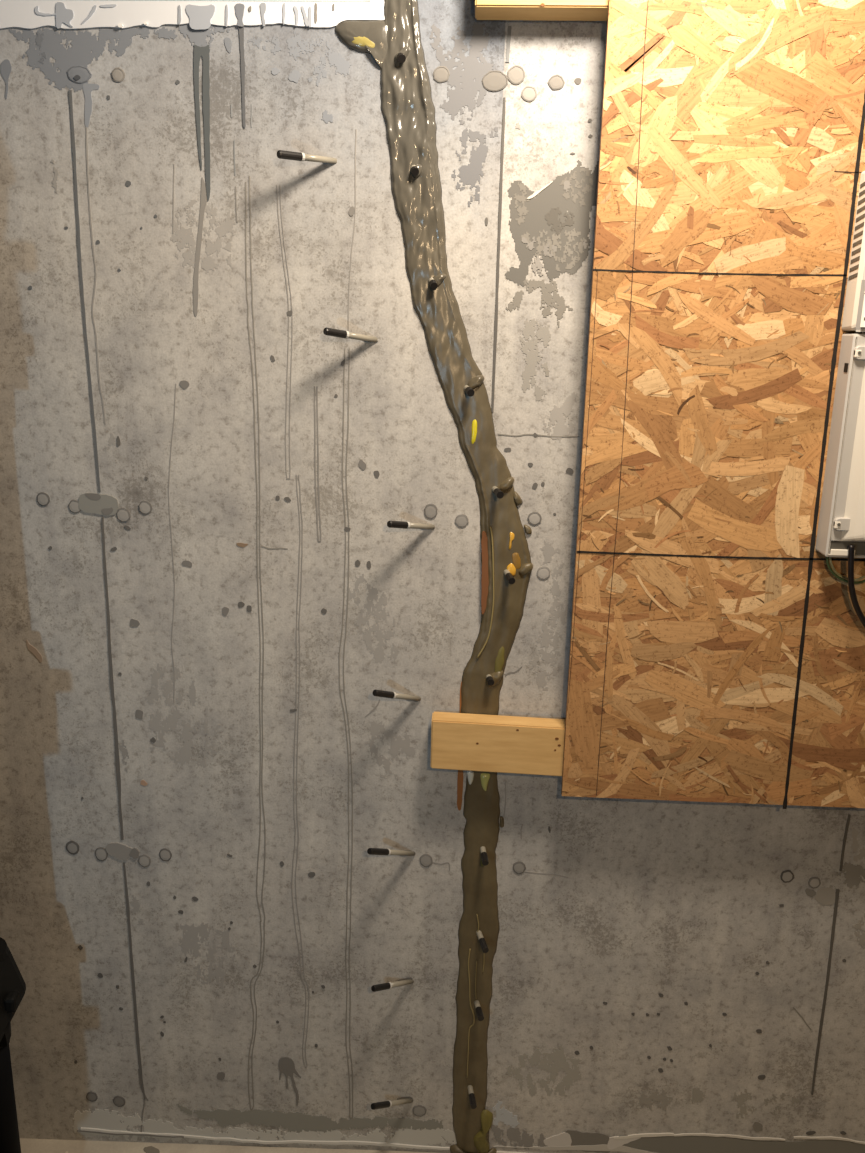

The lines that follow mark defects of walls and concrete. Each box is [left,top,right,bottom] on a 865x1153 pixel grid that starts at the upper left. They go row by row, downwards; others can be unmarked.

water stain [0,24,232,128]
water stain [505,160,599,442]
water stain [80,129,450,1153]
peeling [493,1132,657,1153]